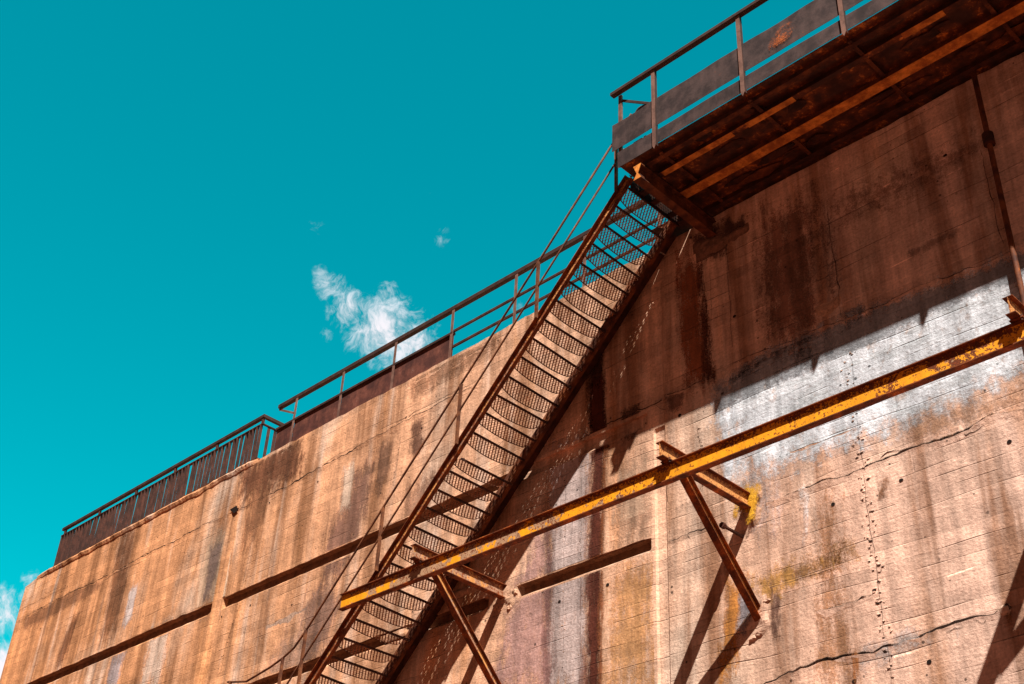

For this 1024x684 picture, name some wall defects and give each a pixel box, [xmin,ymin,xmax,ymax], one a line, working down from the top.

water stain [711,180,1024,441]
water stain [543,453,592,511]
water stain [723,346,1024,529]
crack [766,409,1024,512]
water stain [192,529,231,609]
water stain [493,516,591,684]
crack [764,611,1001,684]